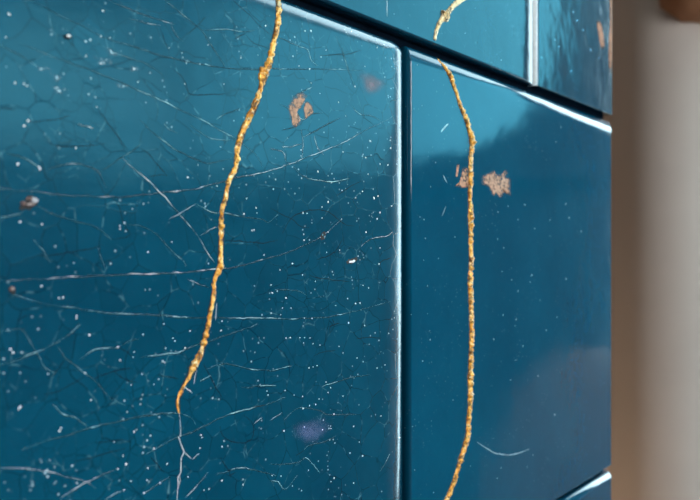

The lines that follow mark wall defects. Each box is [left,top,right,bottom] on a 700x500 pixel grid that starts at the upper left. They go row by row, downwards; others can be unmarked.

crack [434,0,465,41]
peeling [289,95,313,126]
peeling [484,171,509,196]
crack [0,0,390,500]
crack [437,58,529,500]